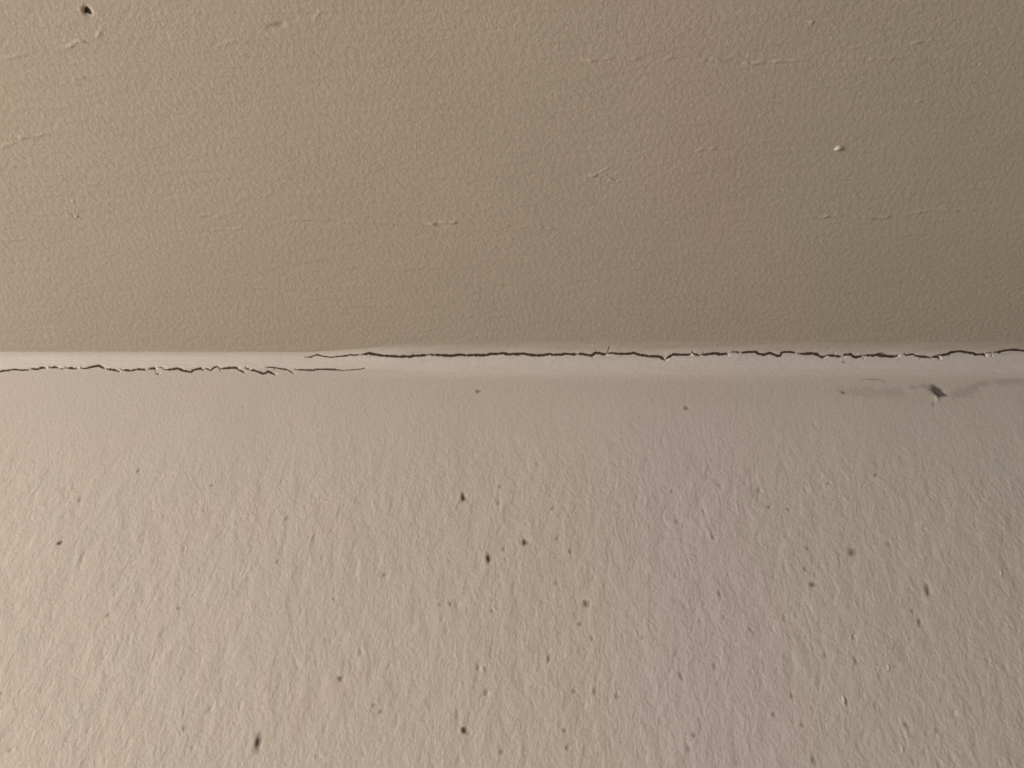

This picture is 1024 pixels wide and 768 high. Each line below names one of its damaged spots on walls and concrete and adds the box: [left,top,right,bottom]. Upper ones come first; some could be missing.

crack [0,346,1024,375]